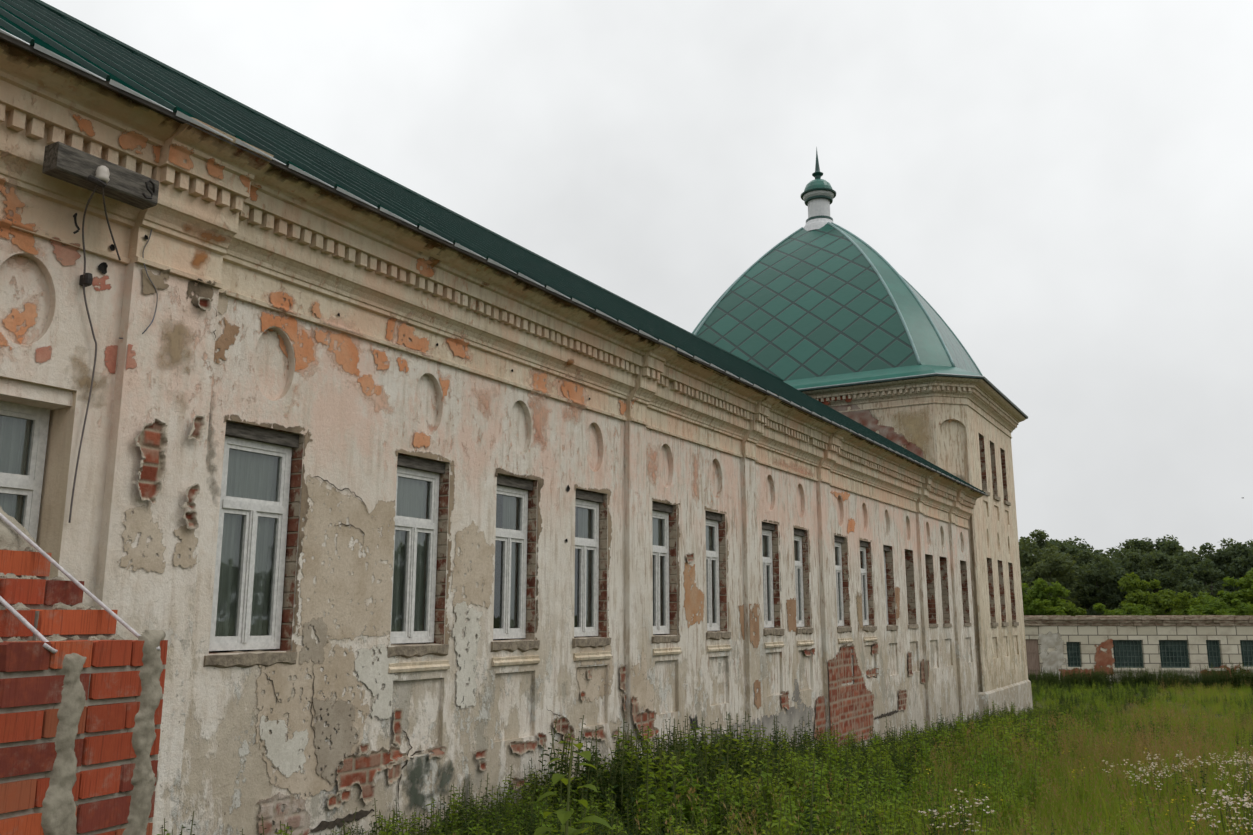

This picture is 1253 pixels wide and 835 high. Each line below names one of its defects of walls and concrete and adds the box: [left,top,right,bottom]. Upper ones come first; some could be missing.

flaking render [0,178,81,266]
flaking render [92,244,115,291]
flaking render [261,292,472,412]
flaking render [188,415,206,441]
flaking render [117,419,200,573]
flaking render [395,432,495,709]
spalling [652,498,695,635]
flaking render [224,414,410,835]
flaking render [781,691,790,711]
flaking render [803,642,879,748]
flaking render [1038,631,1115,681]